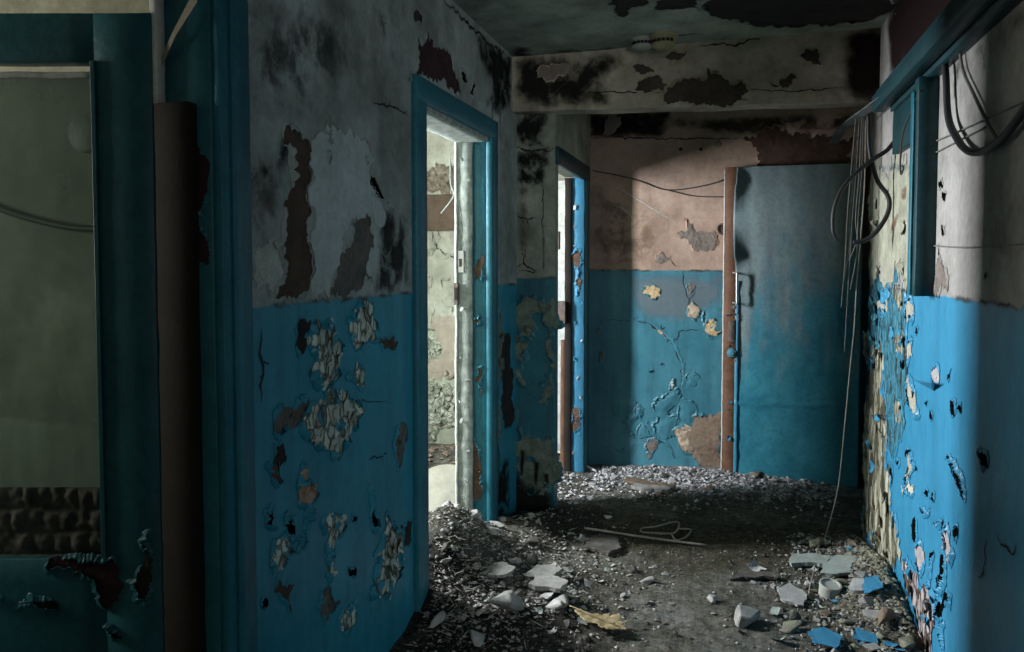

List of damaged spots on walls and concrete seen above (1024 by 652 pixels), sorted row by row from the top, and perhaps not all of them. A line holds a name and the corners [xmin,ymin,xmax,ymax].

spalling [409,6,468,99]
spalling [633,63,753,109]
spalling [606,0,899,29]
spalling [677,218,719,252]
peeling [252,119,399,510]
spalling [685,283,739,337]
peeling [498,294,576,509]
crack [607,317,700,412]
spalling [671,402,733,468]
peeling [860,148,958,652]
peeling [43,528,156,636]
peeling [370,511,413,601]